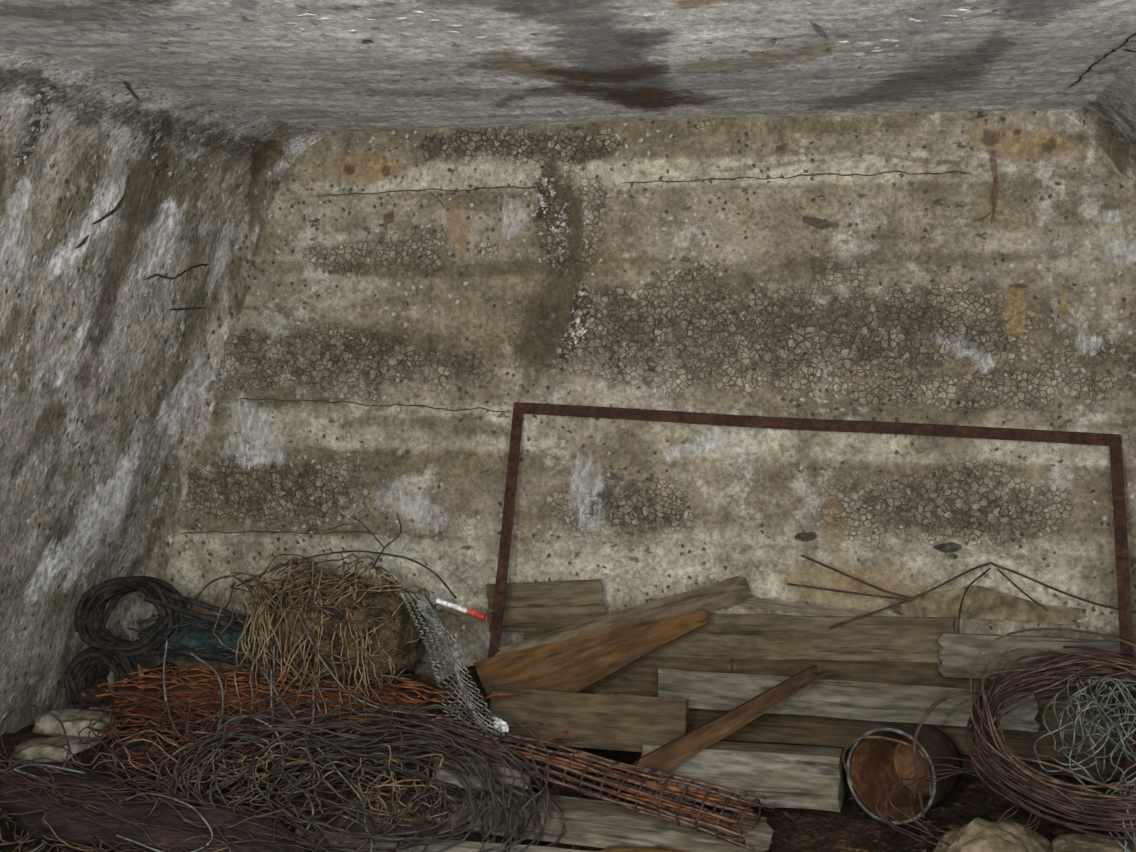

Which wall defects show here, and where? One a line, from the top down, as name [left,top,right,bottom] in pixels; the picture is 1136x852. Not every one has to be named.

leakage [430,0,675,111]
crack [75,193,126,249]
crack [145,264,210,280]
crack [169,304,204,312]